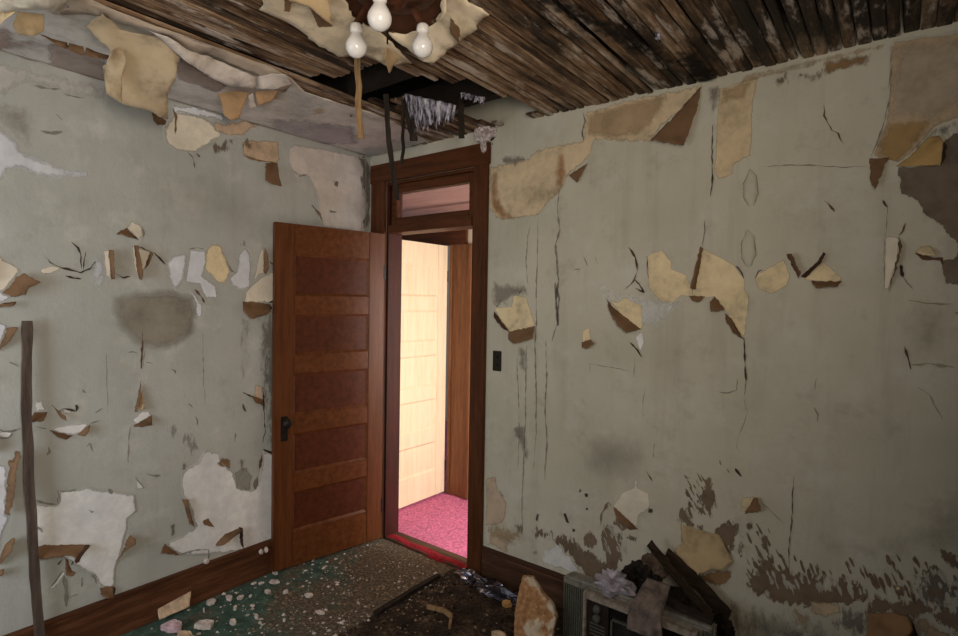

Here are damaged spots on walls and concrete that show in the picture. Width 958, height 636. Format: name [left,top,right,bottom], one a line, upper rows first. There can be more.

spalling [898,133,958,285]
flaking render [186,250,217,317]
flaking render [230,249,250,289]
leakage [119,294,194,346]
spalling [679,477,717,530]
spalling [535,502,636,578]
spalling [715,520,767,557]
spalling [746,545,958,634]